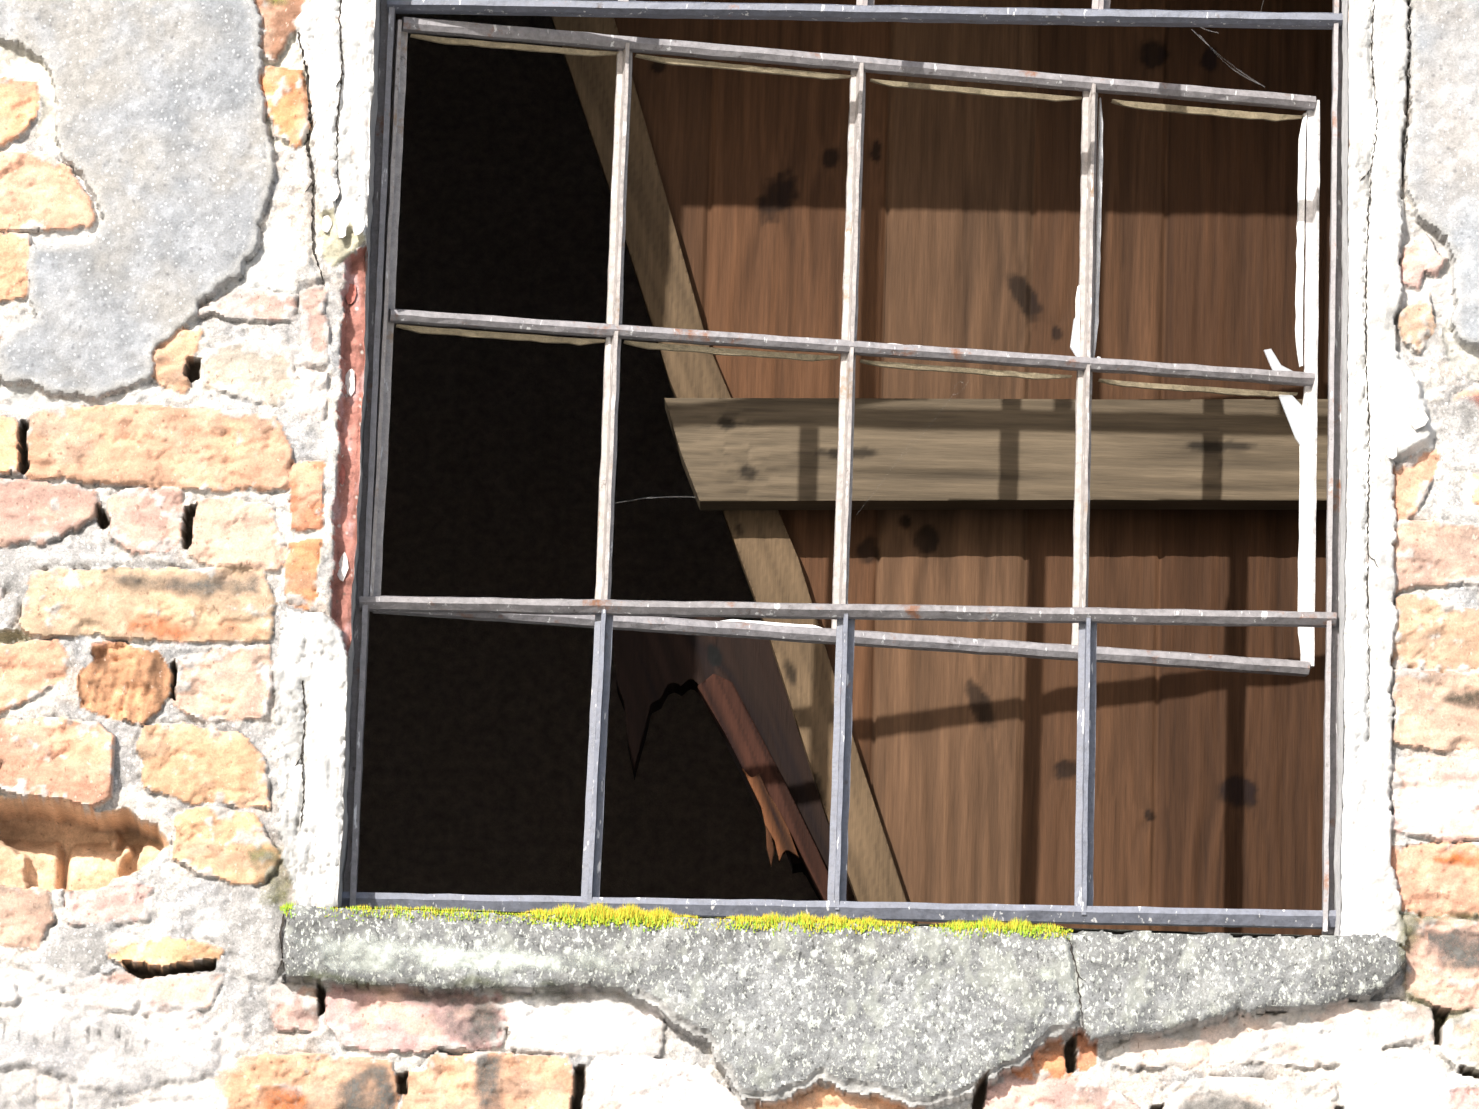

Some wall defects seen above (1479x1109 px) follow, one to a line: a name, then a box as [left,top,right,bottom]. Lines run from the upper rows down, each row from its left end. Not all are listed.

crack [297,0,344,286]
spalling [185,208,300,330]
spalling [1394,208,1479,380]
peeling [183,356,203,383]
peeling [319,180,368,658]
crack [1360,0,1411,729]
peeling [182,500,198,550]
spalling [77,641,178,725]
spalling [0,792,170,891]
spalling [636,985,1084,1109]
crack [1067,933,1086,1025]
peeling [1432,1005,1452,1045]